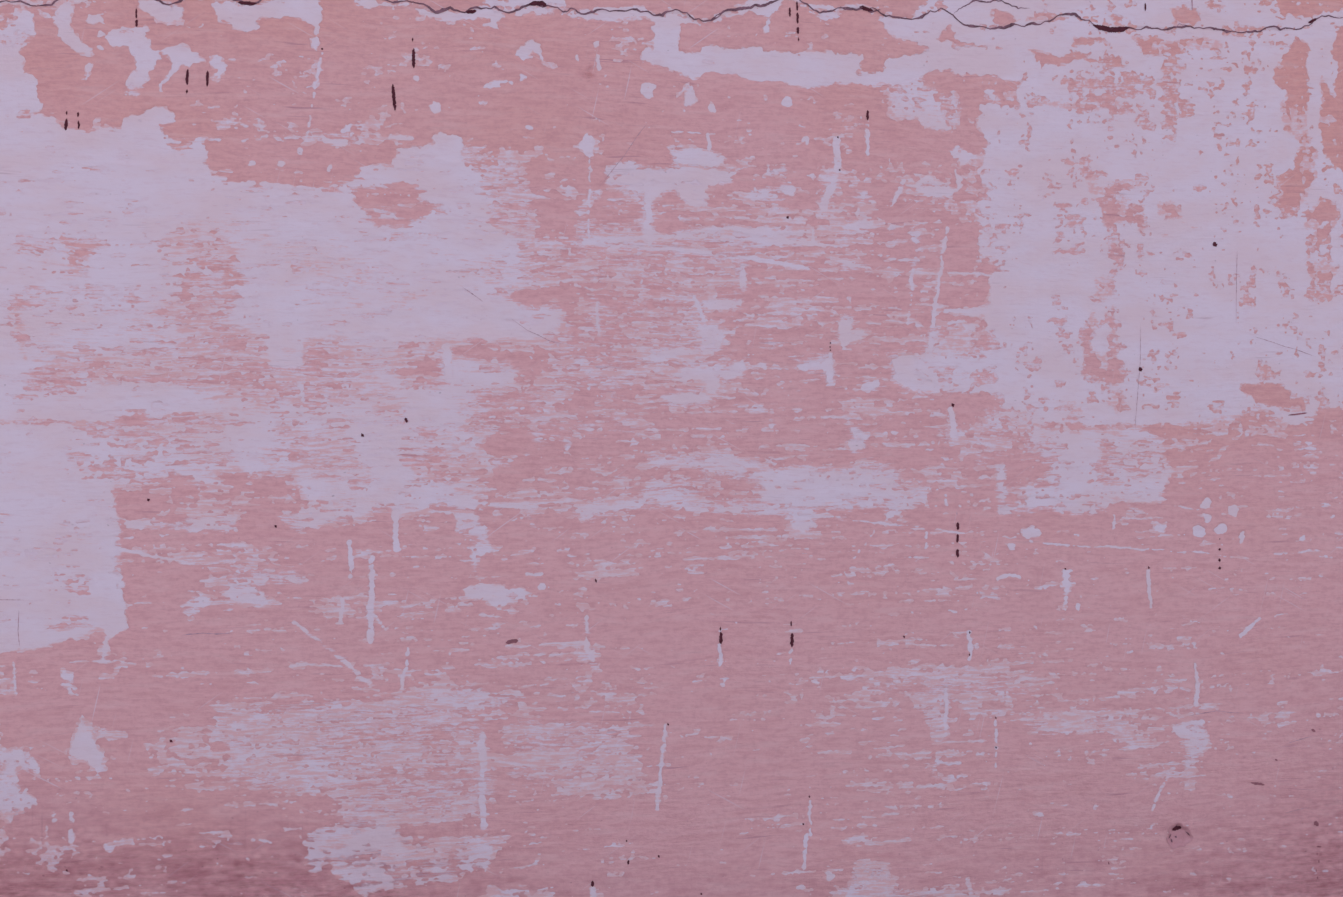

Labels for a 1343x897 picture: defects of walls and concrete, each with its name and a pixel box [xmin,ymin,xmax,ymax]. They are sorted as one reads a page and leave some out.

crack [0,0,58,8]
crack [233,0,261,8]
crack [386,0,1343,33]
peeling [361,38,451,88]
peeling [515,39,558,69]
peeling [478,60,527,105]
peeling [0,662,18,695]